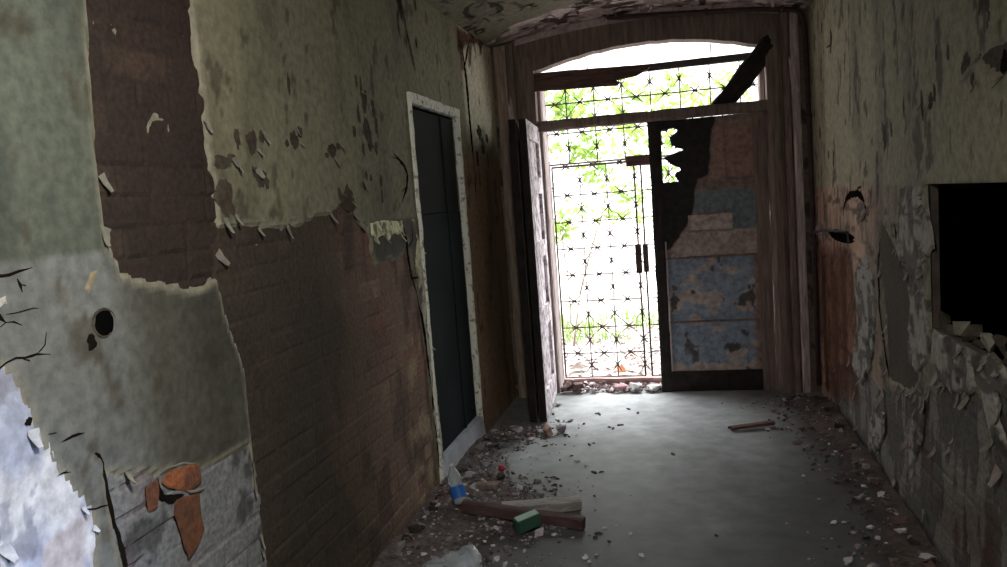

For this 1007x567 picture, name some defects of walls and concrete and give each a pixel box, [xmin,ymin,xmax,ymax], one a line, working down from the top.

peeling [462,0,807,45]
flaking render [958,42,1007,93]
spalling [815,224,855,244]
crack [0,267,34,327]
crack [0,332,47,369]
flaking render [832,184,1007,567]
peeling [0,366,101,567]
crack [49,432,146,567]